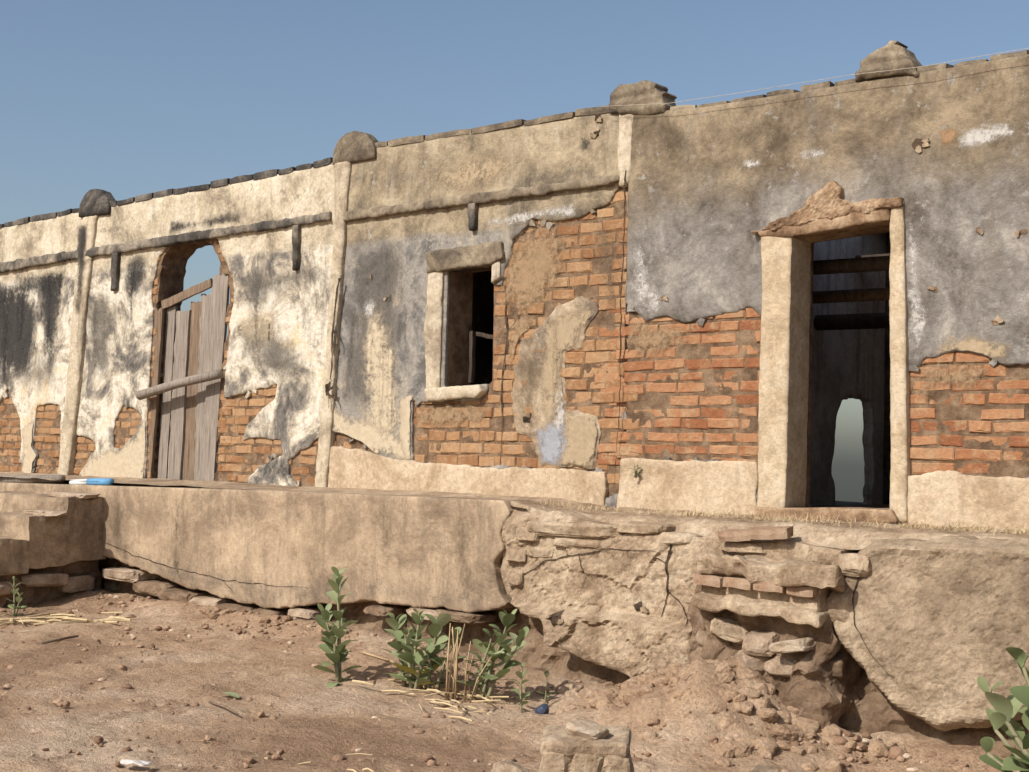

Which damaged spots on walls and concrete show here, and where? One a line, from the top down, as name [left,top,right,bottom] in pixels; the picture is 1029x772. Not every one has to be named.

leakage [0,274,63,381]
flaking render [206,239,318,487]
leakage [250,326,297,374]
leakage [244,269,316,307]
leakage [348,245,398,401]
flaking render [333,187,761,497]
flaking render [908,337,1029,478]
crack [106,543,307,592]
crack [524,544,688,626]
crack [852,577,894,679]